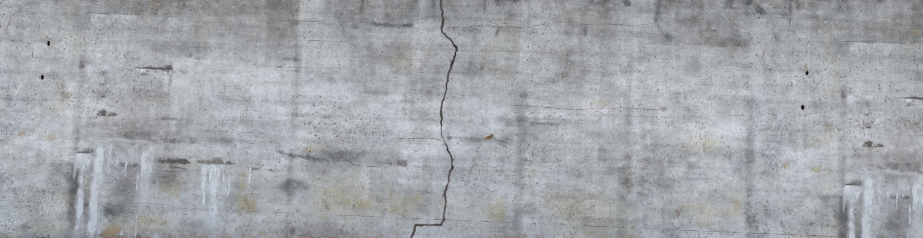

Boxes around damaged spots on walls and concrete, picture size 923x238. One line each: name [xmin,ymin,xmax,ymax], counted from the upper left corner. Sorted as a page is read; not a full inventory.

crack [398,0,471,238]
leakage [75,145,152,238]
leakage [202,161,233,224]
leakage [843,177,923,238]